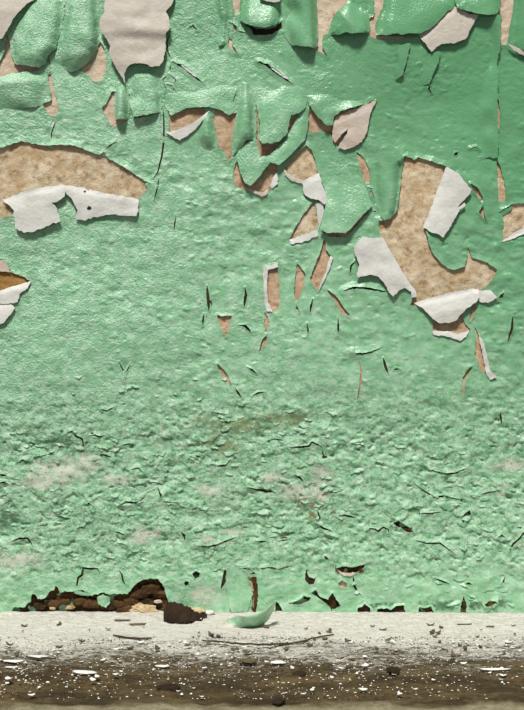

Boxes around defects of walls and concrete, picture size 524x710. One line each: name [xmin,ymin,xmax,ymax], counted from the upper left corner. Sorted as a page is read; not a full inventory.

peeling [0,0,524,403]
crack [0,455,33,488]
crack [60,403,292,596]
crack [243,471,308,497]
crack [410,464,504,518]
crack [311,507,393,538]
crack [8,533,37,550]
crack [411,536,459,557]
spalling [8,574,172,626]
spalling [182,569,202,588]
spalling [355,593,436,613]
peeling [446,576,515,613]